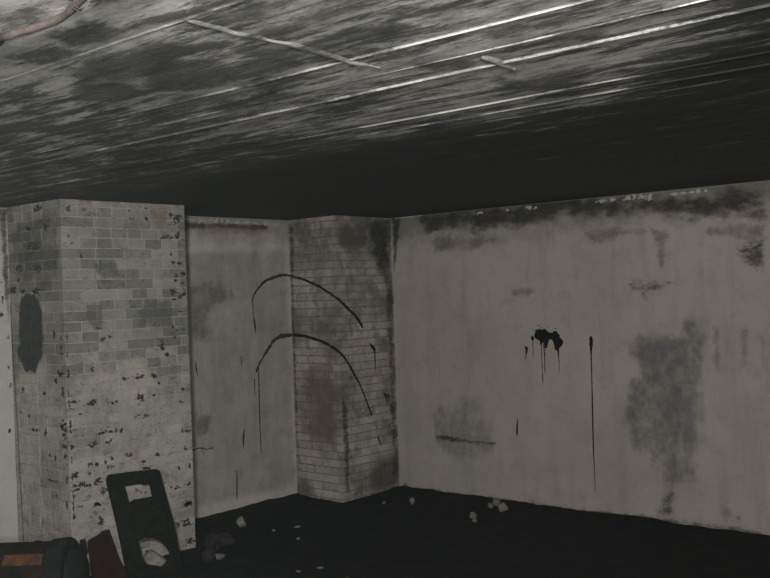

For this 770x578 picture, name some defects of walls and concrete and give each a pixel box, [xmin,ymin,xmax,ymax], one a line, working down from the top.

leakage [252,227,363,332]
leakage [17,293,43,373]
leakage [256,324,372,416]